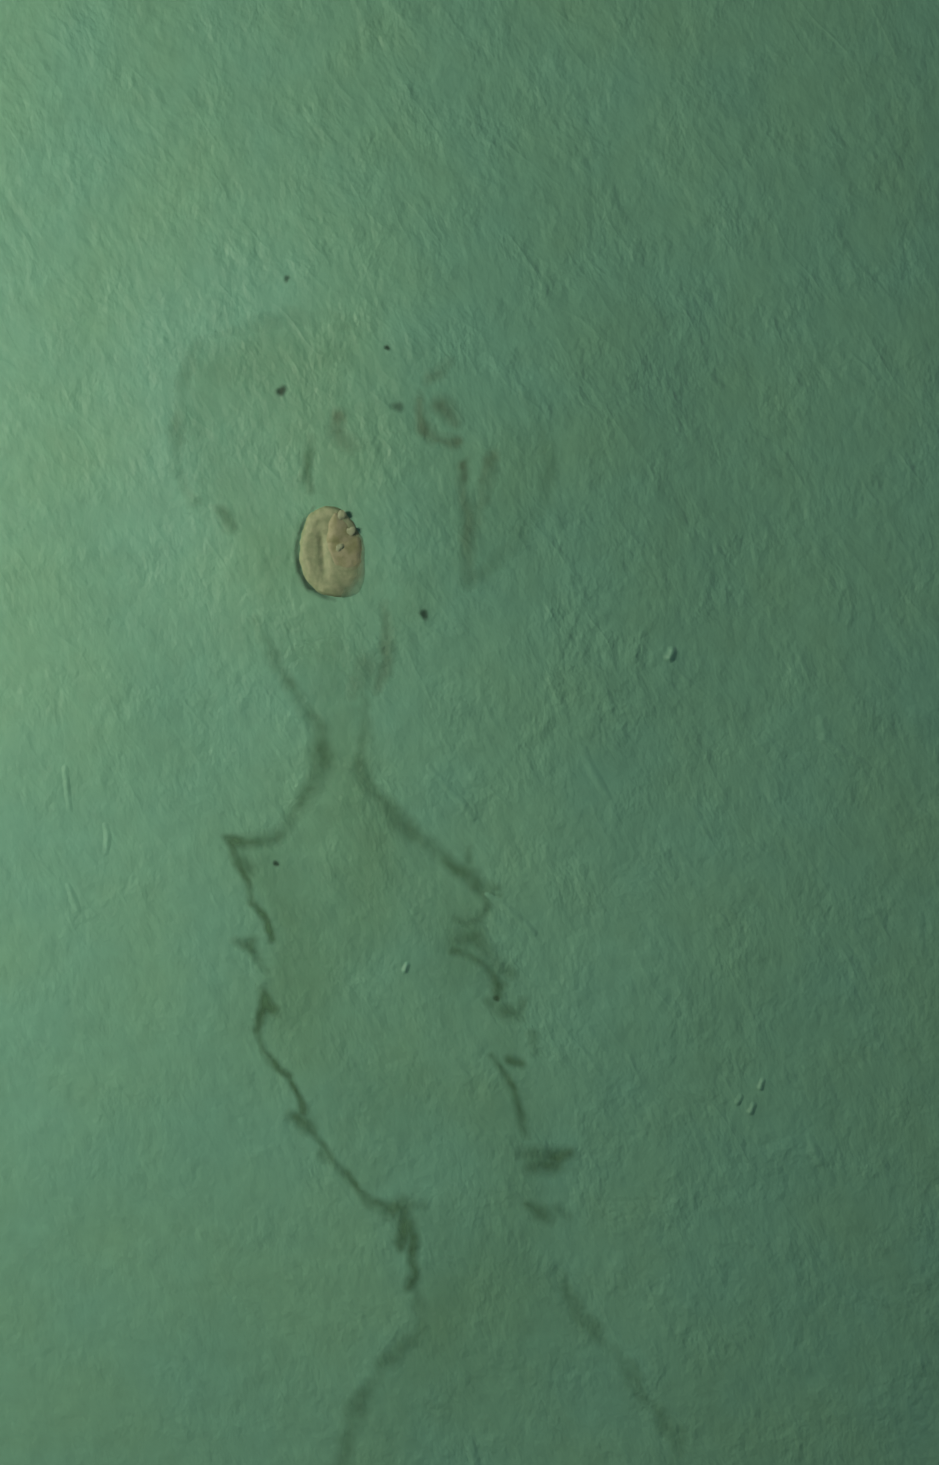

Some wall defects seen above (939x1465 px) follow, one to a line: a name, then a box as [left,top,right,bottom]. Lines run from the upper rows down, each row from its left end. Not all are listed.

damp [256,993,276,1031]